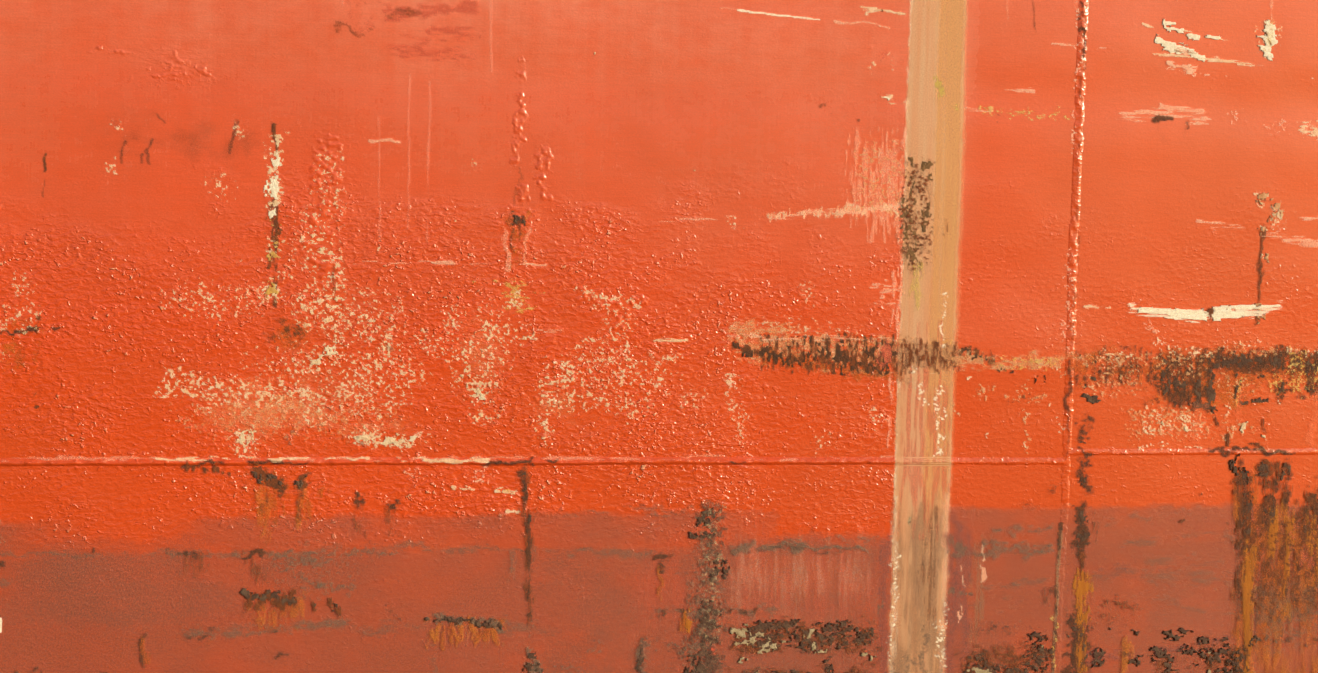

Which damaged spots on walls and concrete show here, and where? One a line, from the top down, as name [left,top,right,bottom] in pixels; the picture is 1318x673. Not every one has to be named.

peeling [1142,19,1280,76]
corrosion [899,157,948,310]
corrosion [1254,192,1318,325]
peeling [1137,304,1281,321]
corrosion [728,322,1318,438]
corrosion [182,459,231,476]
corrosion [248,460,311,524]
corrosion [240,549,342,625]
corrosion [424,613,506,651]
corrosion [483,457,558,626]
corrosion [729,584,888,673]
corrosion [1097,446,1318,673]